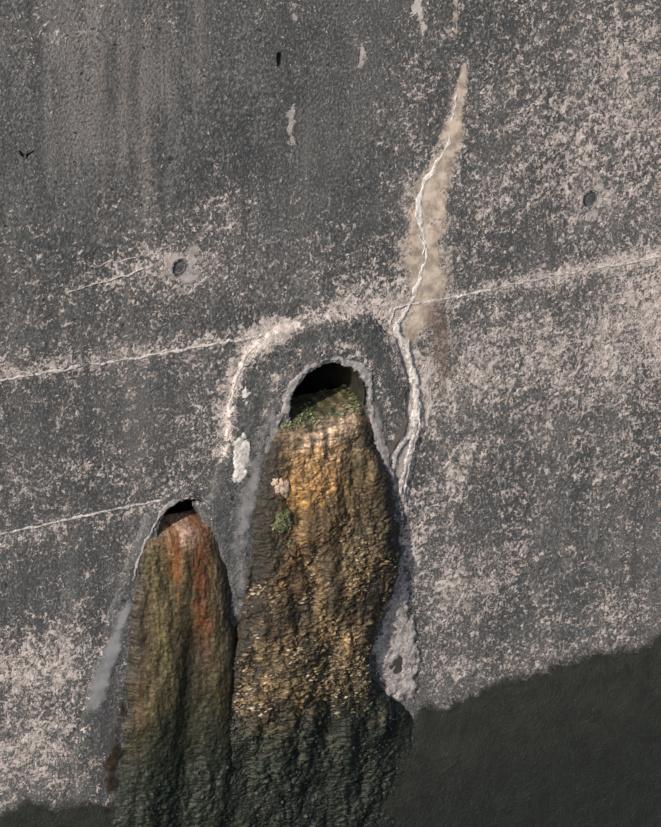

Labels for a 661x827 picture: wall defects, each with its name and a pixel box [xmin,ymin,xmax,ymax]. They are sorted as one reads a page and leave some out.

leakage [228,340,264,412]
crack [390,92,458,519]
leakage [396,63,468,347]
rust [172,532,181,581]
leakage [0,384,661,827]